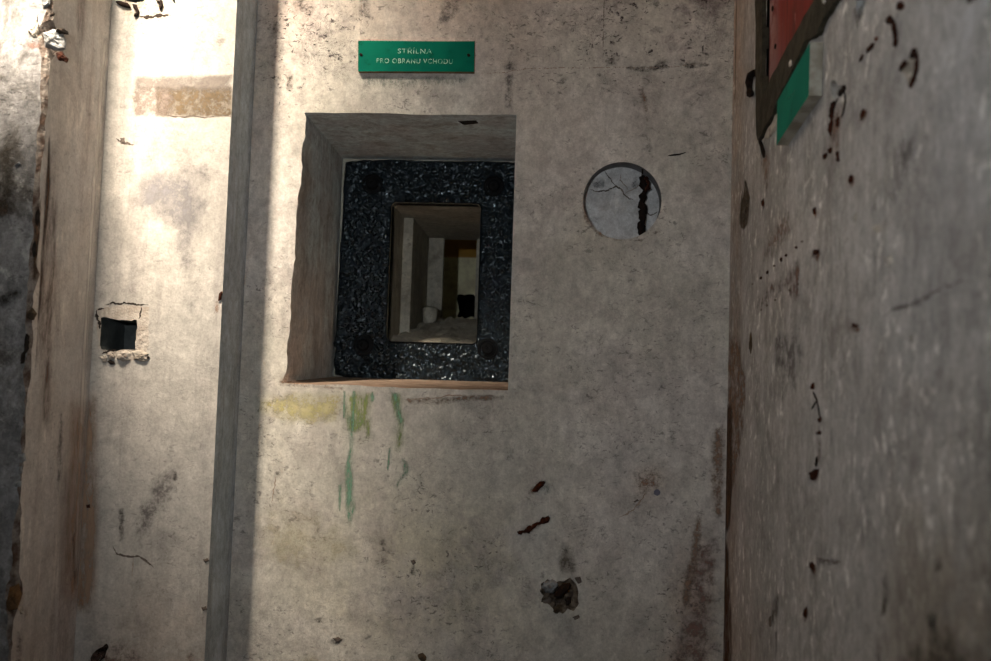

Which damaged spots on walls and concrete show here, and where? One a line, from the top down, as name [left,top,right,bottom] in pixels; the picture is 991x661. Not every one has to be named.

spalling [27,0,69,63]
hole [116,0,175,20]
rust [885,1,905,47]
rust [822,79,846,162]
crack [592,172,657,216]
hole [95,301,150,365]
water stain [712,428,723,515]
spalling [540,548,582,620]
water stain [676,519,714,661]